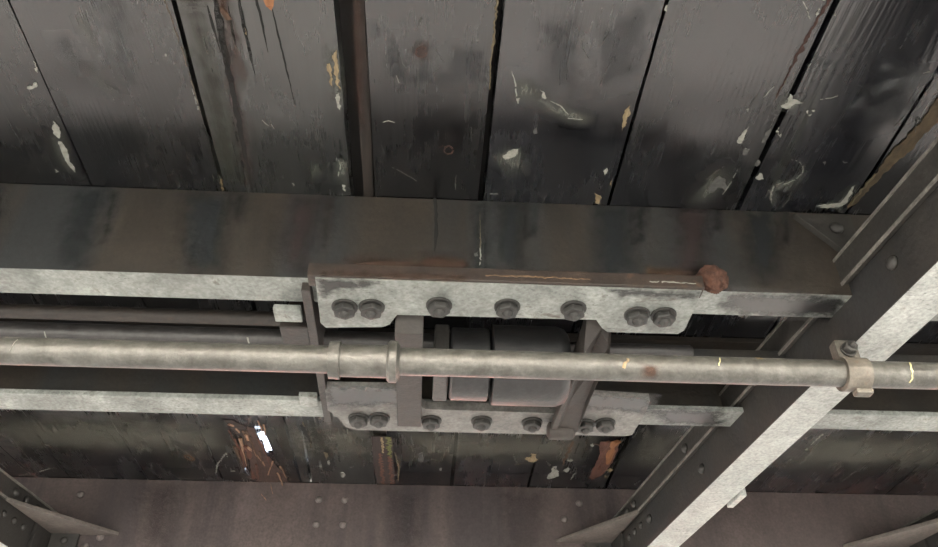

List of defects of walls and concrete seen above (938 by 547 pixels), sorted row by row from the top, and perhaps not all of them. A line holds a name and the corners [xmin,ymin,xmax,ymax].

peeling [326,49,341,110]
peeling [512,73,587,122]
peeling [780,94,815,116]
peeling [52,121,75,172]
peeling [737,128,750,155]
peeling [701,166,738,201]
peeling [769,159,804,207]
peeling [818,185,855,209]
rust [649,264,729,295]